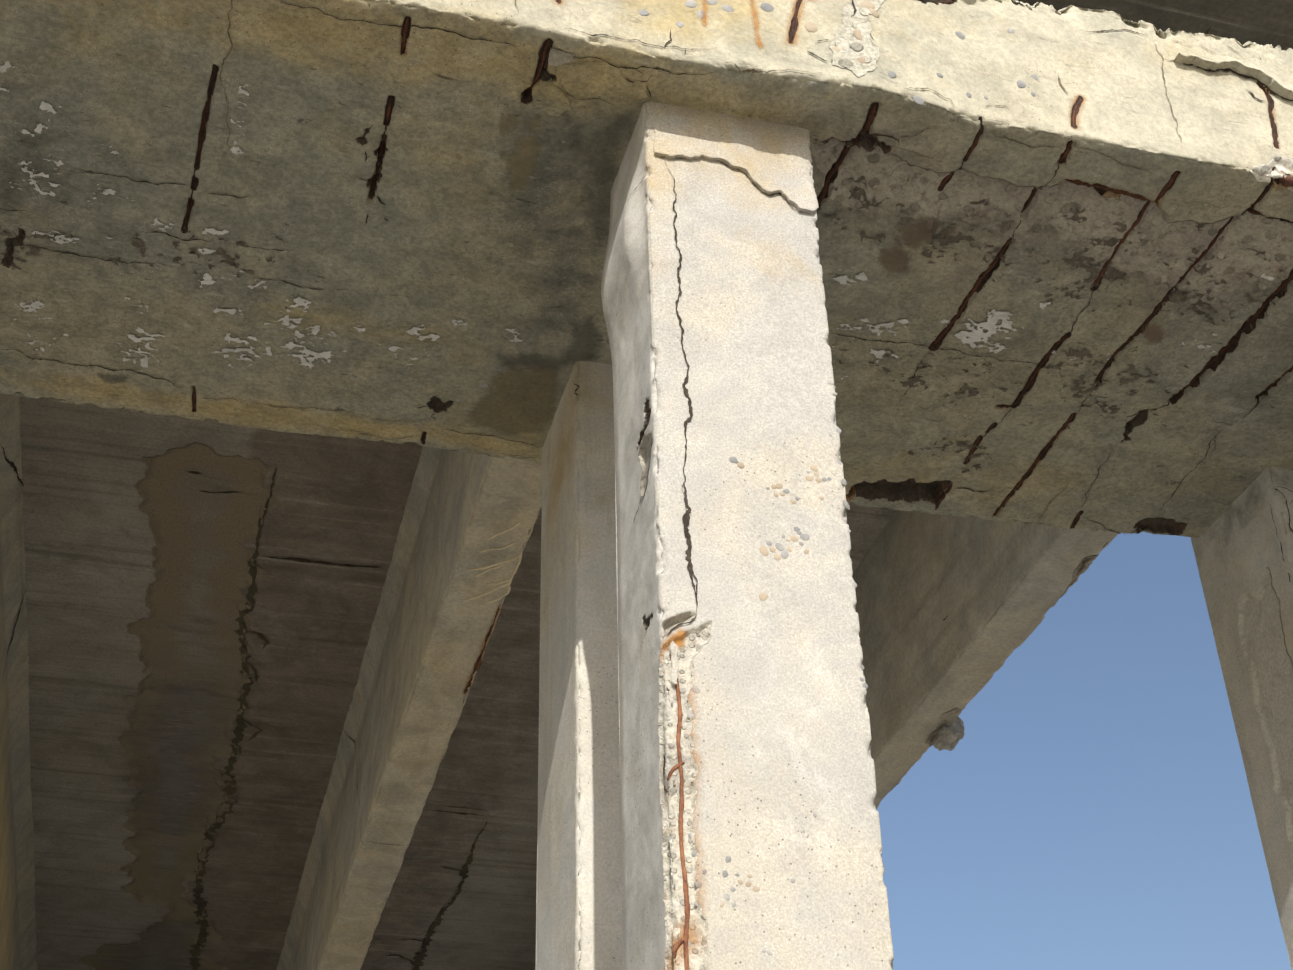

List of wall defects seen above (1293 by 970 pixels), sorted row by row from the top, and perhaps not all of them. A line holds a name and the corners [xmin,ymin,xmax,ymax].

peeling [521,38,648,116]
efflorescence [21,98,61,137]
efflorescence [9,155,64,197]
spalling [652,53,1293,516]
efflorescence [116,297,165,374]
water stain [208,297,346,369]
crack [621,135,806,605]
spalling [1134,517,1187,536]
corrosion [663,630,686,655]
crack [188,468,382,970]
spalling [642,611,712,970]
crack [386,804,487,970]